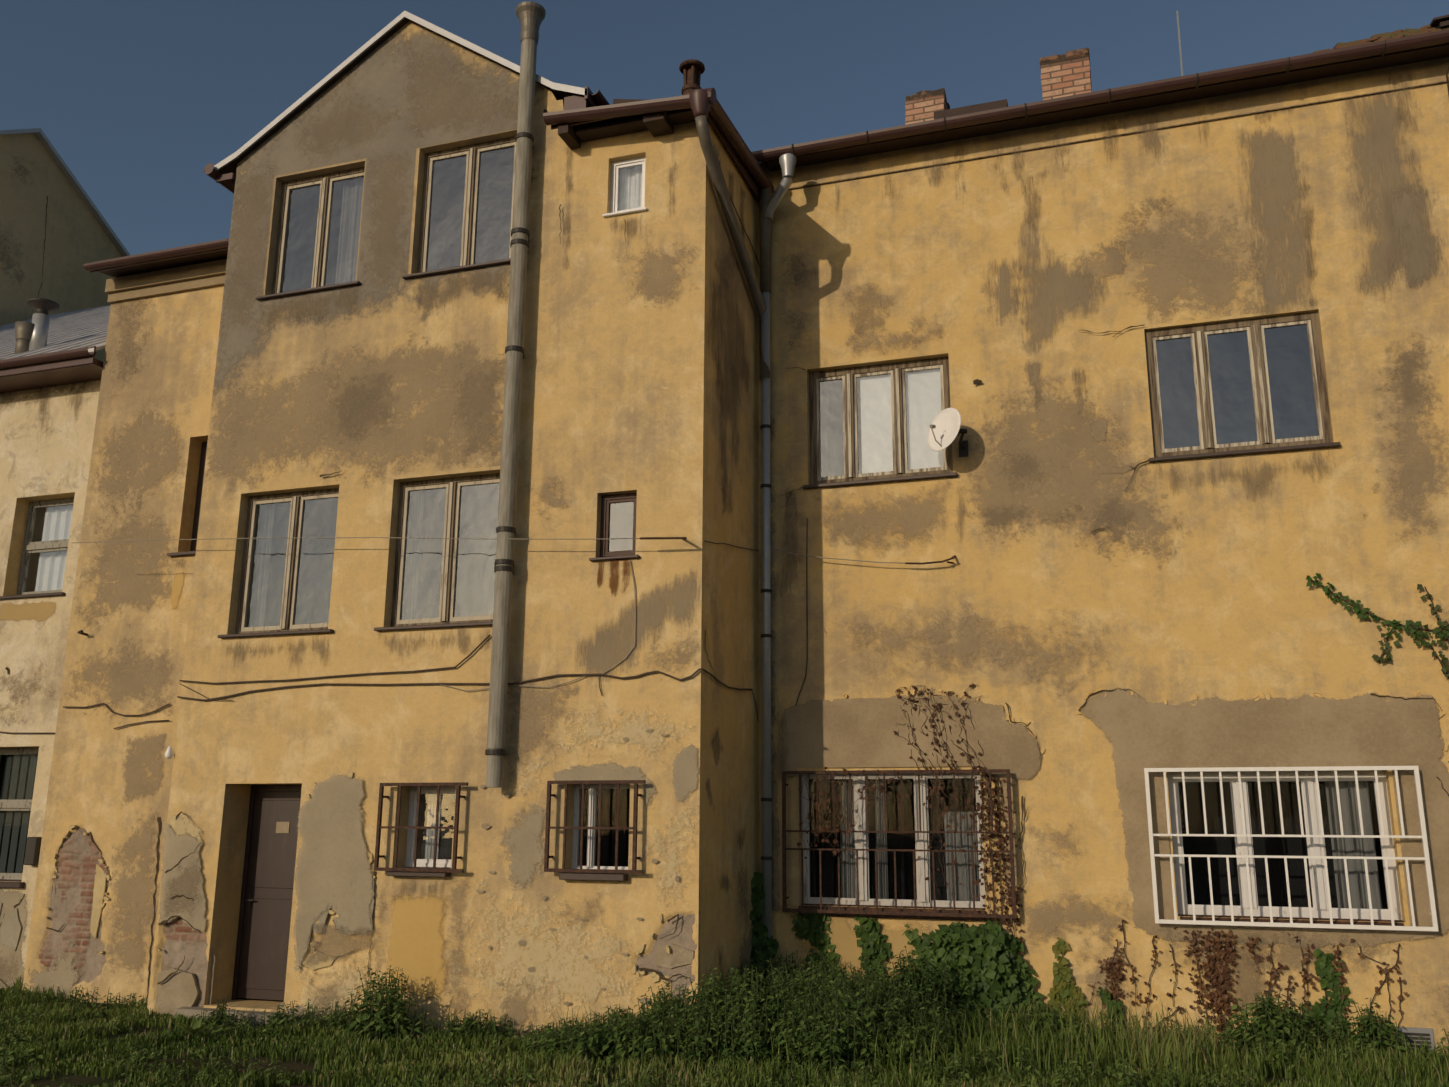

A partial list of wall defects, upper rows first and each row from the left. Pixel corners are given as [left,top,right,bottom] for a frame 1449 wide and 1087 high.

water stain [208,29,544,487]
water stain [818,112,1314,559]
water stain [1349,92,1439,290]
water stain [1376,341,1447,533]
rust [597,559,630,594]
peeling [503,703,685,798]
flaking render [0,825,111,1001]
peeling [156,811,215,1017]
peeling [280,772,377,1022]
peeling [451,811,701,1030]